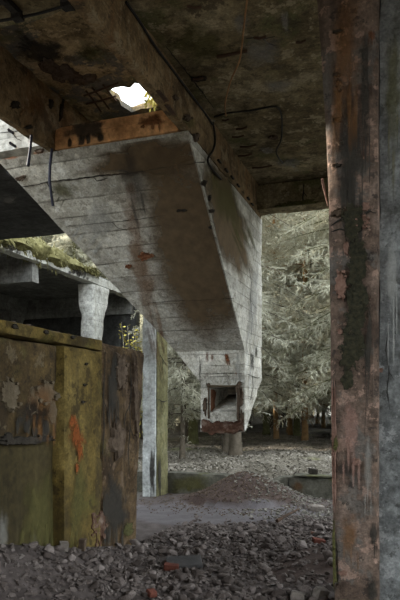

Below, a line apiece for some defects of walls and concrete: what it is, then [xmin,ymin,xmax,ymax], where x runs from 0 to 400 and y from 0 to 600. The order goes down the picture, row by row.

rust [138,115,162,131]
damp [90,139,255,338]
peeling [334,269,347,301]
peeling [0,376,61,425]